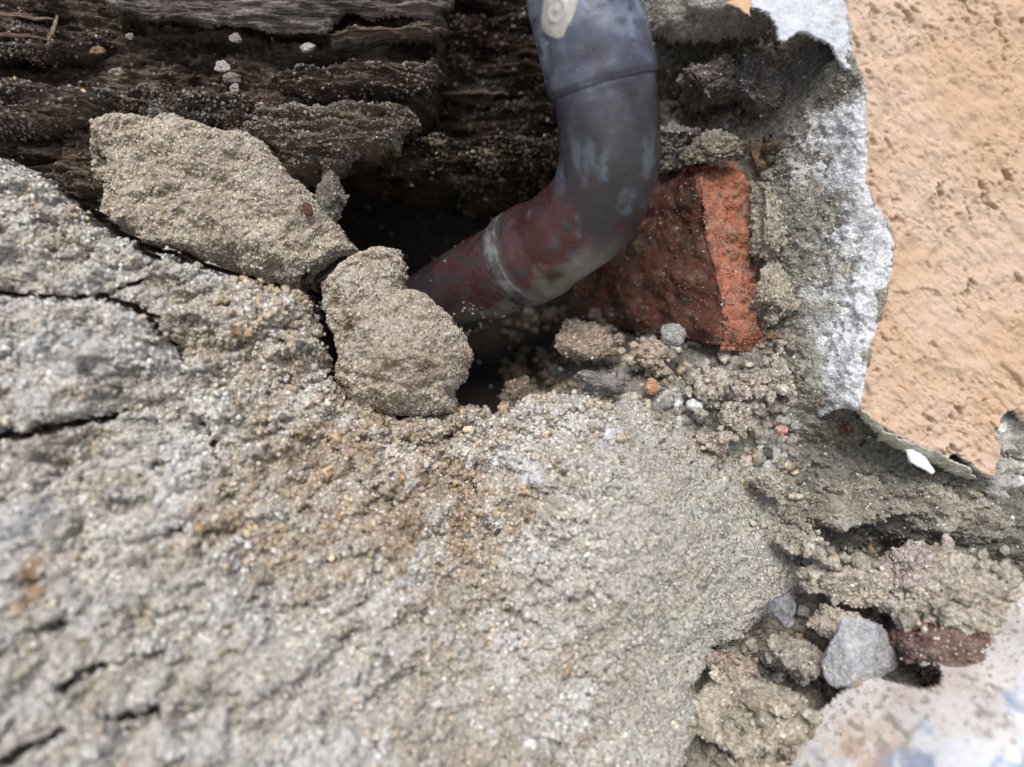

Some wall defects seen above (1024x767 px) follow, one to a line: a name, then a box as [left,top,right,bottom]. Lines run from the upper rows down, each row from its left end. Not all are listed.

crack [0,192,348,360]
crack [0,409,133,442]